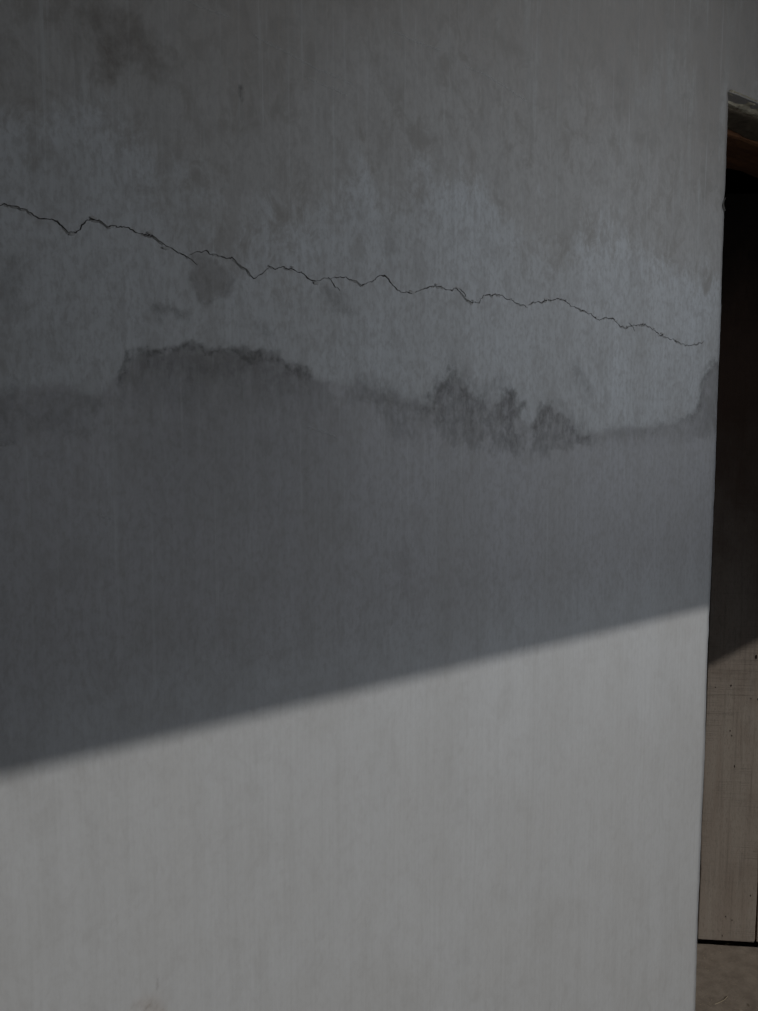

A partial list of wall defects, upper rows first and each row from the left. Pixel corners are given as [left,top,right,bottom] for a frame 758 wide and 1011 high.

crack [0,203,704,347]